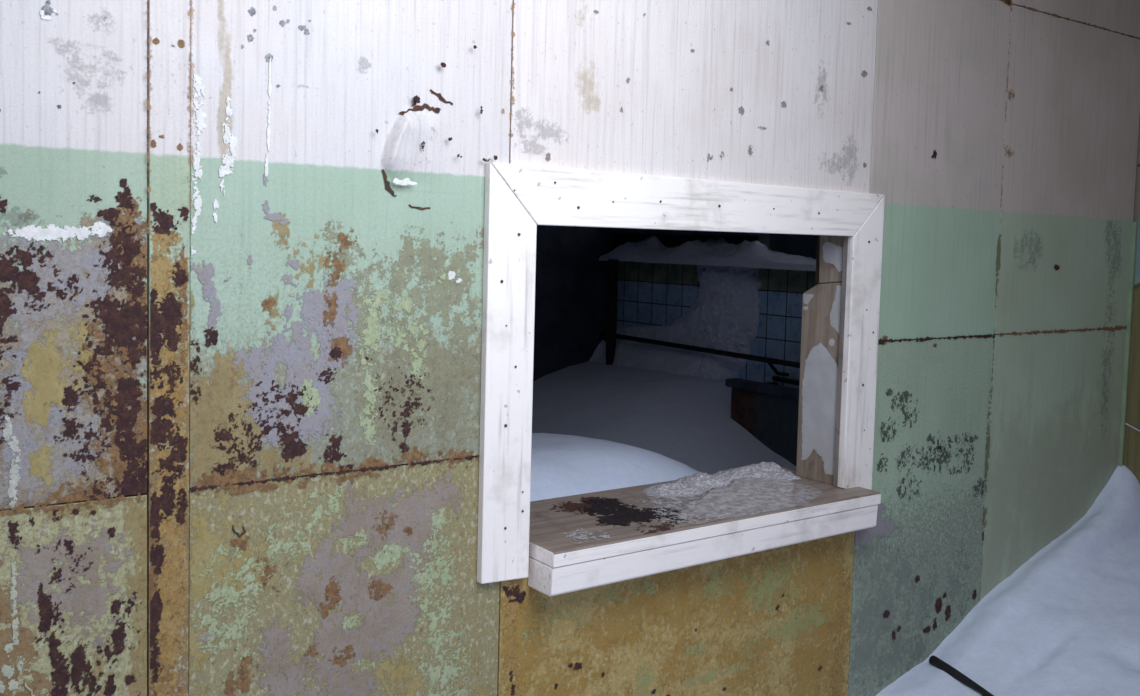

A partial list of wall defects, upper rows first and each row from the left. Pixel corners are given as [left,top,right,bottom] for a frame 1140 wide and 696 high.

rust [145,0,195,164]
rust [1002,0,1140,121]
peeling [191,74,238,331]
peeling [262,174,291,225]
peeling [0,208,147,696]
rust [0,178,479,696]
peeling [191,221,484,696]
peeling [801,242,843,475]
rust [878,325,1127,493]
rust [923,592,951,633]